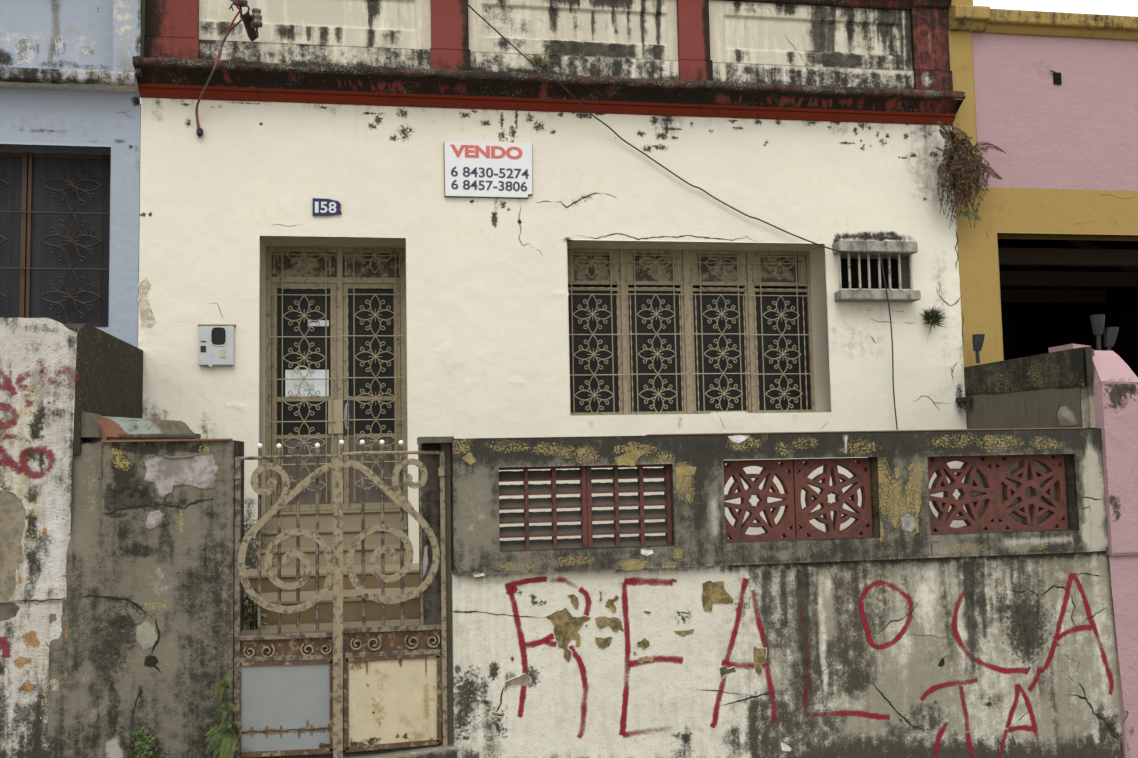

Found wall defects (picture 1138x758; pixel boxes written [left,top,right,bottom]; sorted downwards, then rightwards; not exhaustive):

water stain [368,0,377,44]
water stain [549,0,661,59]
water stain [811,6,860,67]
crack [518,193,616,253]
crack [568,233,752,241]
flaking render [143,452,219,530]
flaking render [0,488,28,623]
peeling [544,591,625,663]
peeling [701,580,735,613]
water stain [958,561,986,672]
crack [1013,573,1130,753]
corrosion [241,720,330,738]